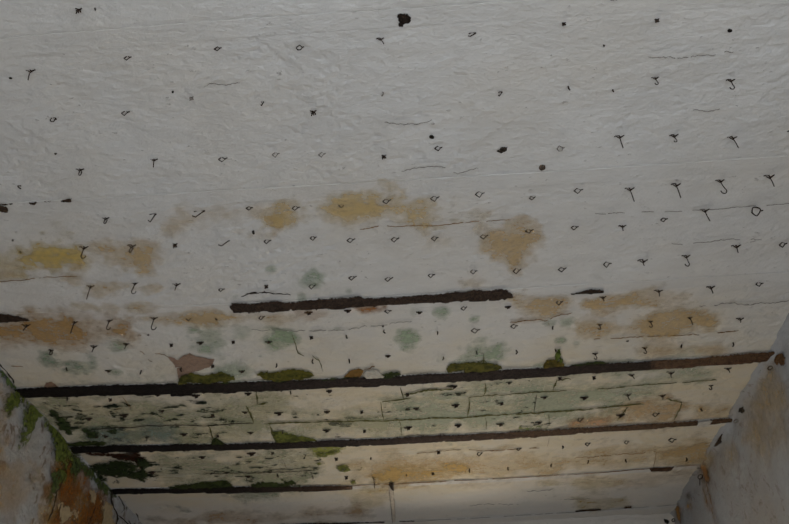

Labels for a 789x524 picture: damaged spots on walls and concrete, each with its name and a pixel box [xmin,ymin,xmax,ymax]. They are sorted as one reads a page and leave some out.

water stain [321,194,428,227]
water stain [19,243,85,268]
water stain [0,310,88,346]
water stain [583,293,717,337]
peeling [169,353,214,379]
mould [42,398,239,442]
water stain [317,401,422,437]
mould [199,452,321,482]